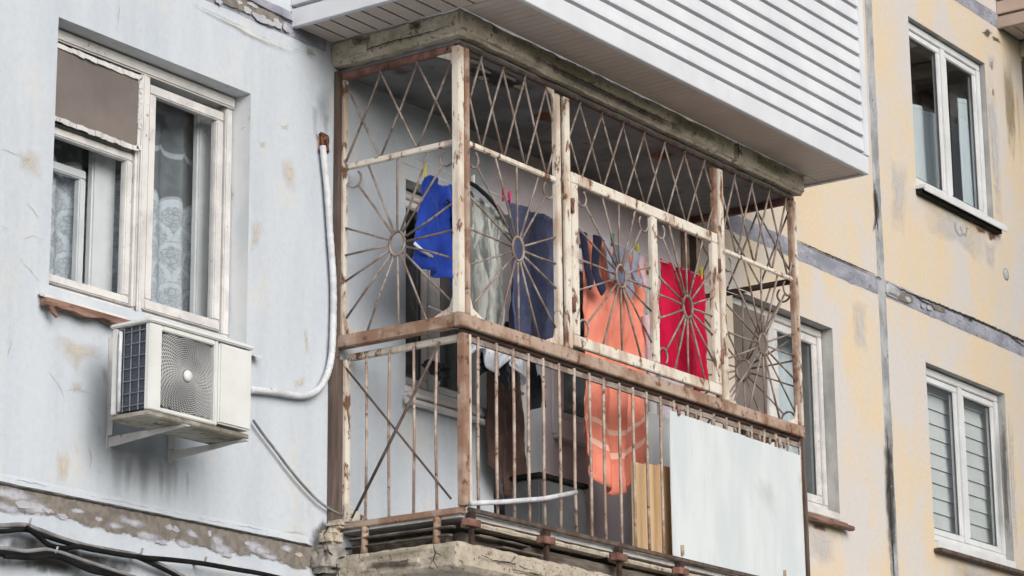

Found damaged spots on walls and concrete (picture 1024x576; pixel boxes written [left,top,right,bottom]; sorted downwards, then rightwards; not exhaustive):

peeling [215,0,293,41]
peeling [0,482,348,576]